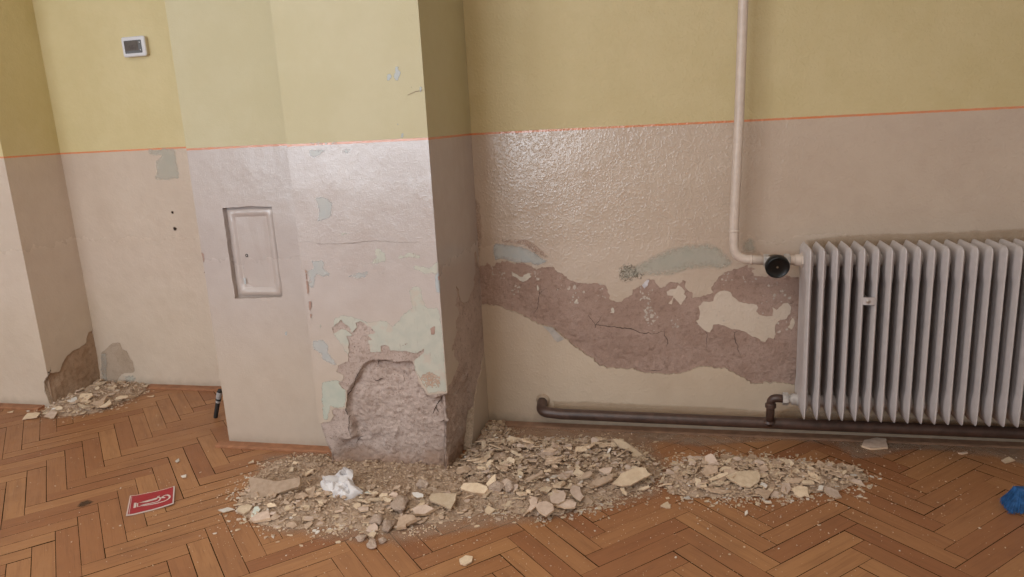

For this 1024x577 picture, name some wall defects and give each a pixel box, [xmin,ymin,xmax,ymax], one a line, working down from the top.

peeling [149,149,178,179]
flaking render [44,331,135,402]
flaking render [305,252,812,469]